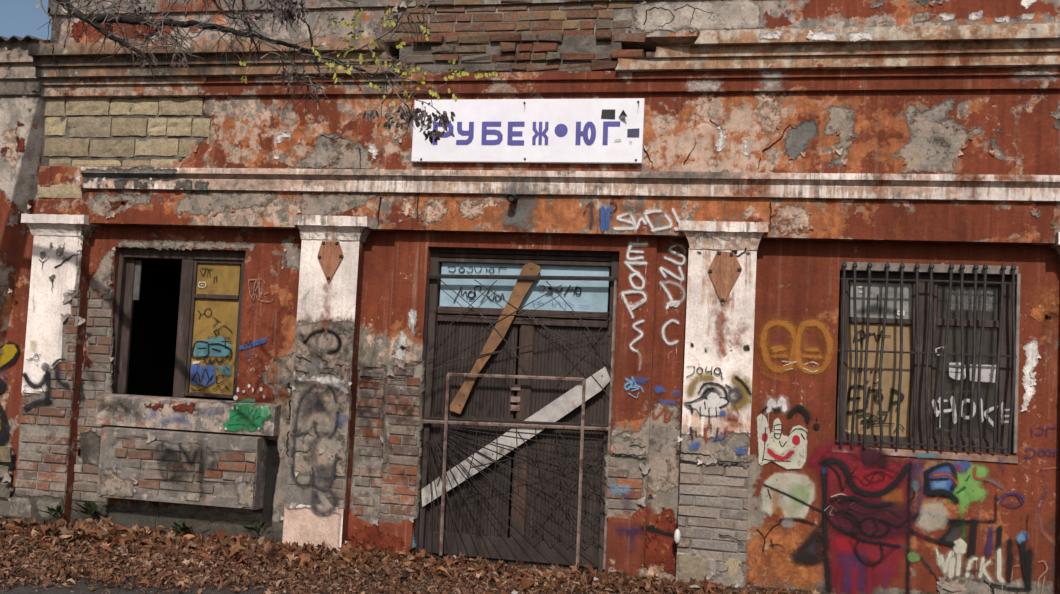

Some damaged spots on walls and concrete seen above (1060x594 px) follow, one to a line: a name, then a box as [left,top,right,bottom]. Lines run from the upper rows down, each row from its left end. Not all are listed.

flaking render [375,0,783,73]
crack [640,4,710,29]
peeling [806,29,874,42]
peeling [969,0,1037,23]
flaking render [0,46,279,237]
flaking render [274,130,378,169]
peeling [688,81,718,90]
flaking render [755,70,858,169]
flaking render [891,98,1005,173]
flaking render [0,236,425,553]
peeling [1021,340,1049,412]
flaking render [604,402,750,588]